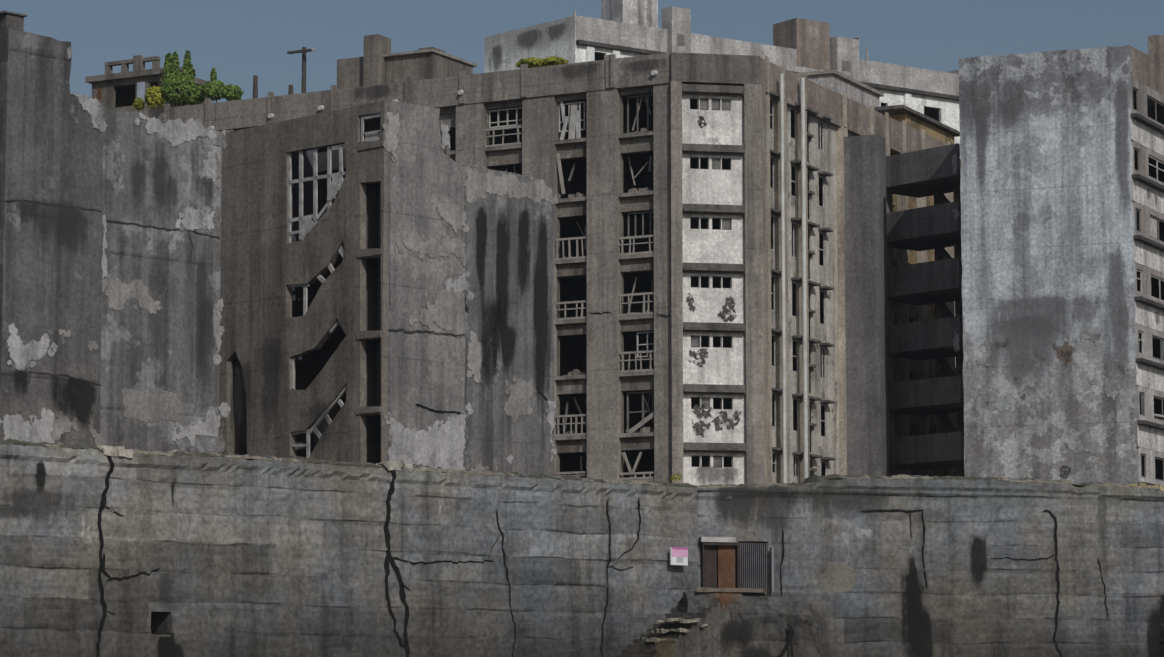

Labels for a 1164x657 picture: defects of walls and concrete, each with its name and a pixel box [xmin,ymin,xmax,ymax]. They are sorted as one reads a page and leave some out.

peeling [134,113,227,188]
peeling [6,323,71,381]
peeling [396,165,558,383]
water stain [476,207,549,398]
peeling [385,403,489,471]
crack [96,455,160,657]
crack [380,464,516,657]
crack [600,498,641,657]
water stain [902,558,933,657]
water stain [971,538,987,585]
crack [992,510,1063,657]
water stain [1147,595,1164,657]